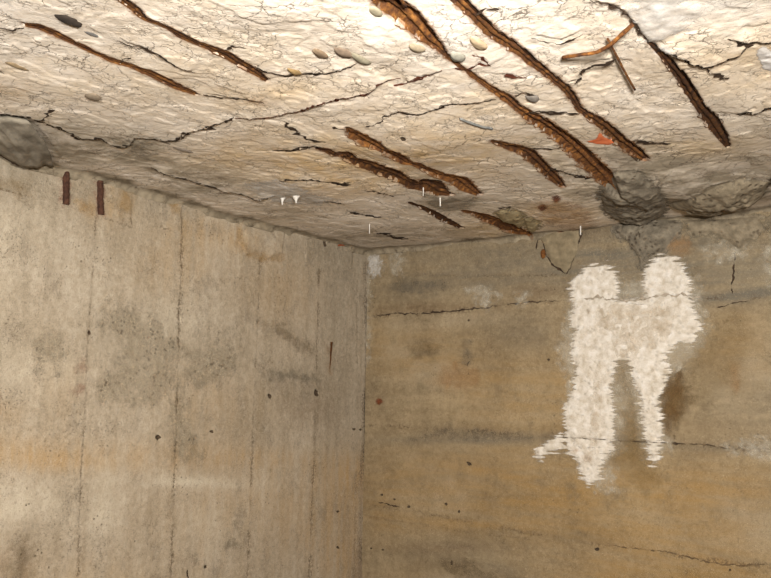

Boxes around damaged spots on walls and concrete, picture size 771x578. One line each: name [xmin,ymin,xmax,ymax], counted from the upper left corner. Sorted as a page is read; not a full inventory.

spalling [0,23,196,95]
crack [118,41,195,73]
spalling [118,0,286,82]
crack [0,55,526,149]
spalling [371,0,650,189]
crack [565,59,616,86]
crack [590,0,770,79]
spalling [648,42,731,147]
crack [738,107,771,116]
crack [151,167,408,240]
spalling [284,116,532,236]
damp [532,253,707,488]